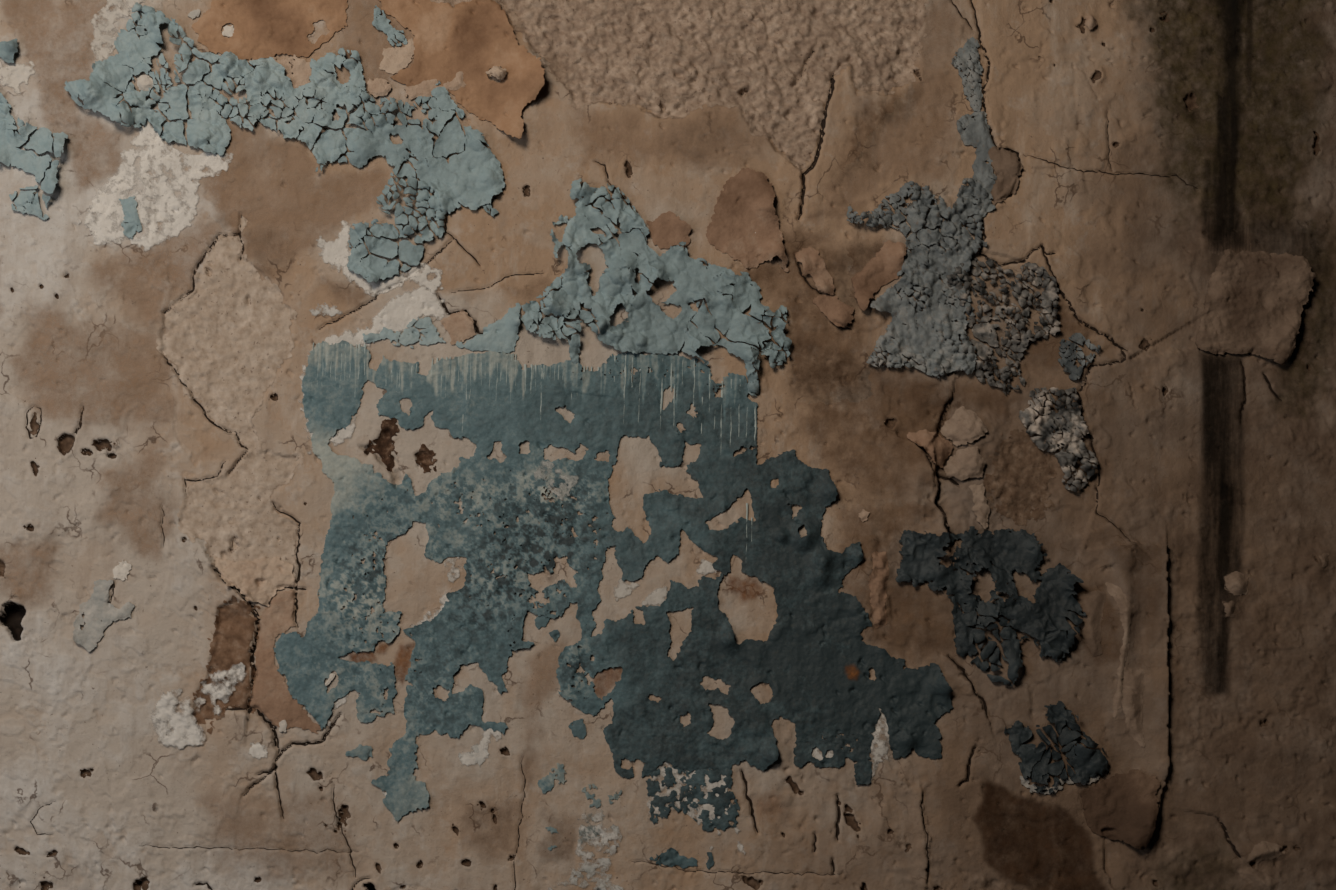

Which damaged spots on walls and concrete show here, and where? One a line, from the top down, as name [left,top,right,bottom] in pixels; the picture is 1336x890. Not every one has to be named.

peeling [0,93,68,220]
flaking render [64,0,929,283]
crack [798,45,839,220]
crack [164,215,244,314]
crack [795,258,822,294]
crack [951,0,1198,539]
crack [161,354,248,546]
peeling [156,37,1101,869]
damp [974,783,1104,890]
flaking render [1004,701,1161,850]